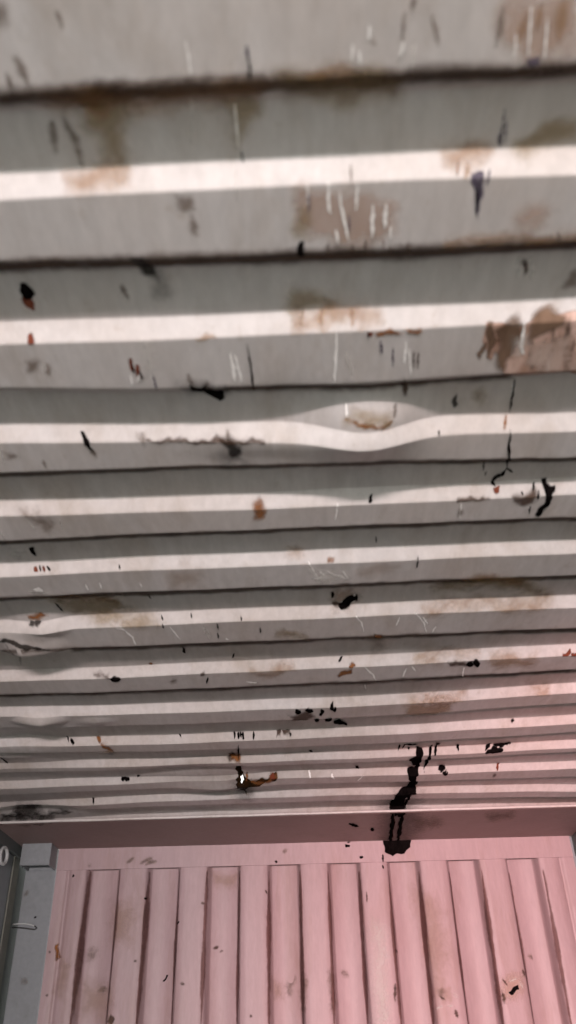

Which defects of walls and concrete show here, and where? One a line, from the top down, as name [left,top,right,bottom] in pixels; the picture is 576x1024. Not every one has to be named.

rust [345,402,396,430]
crack [491,378,515,494]
rust [0,496,576,544]